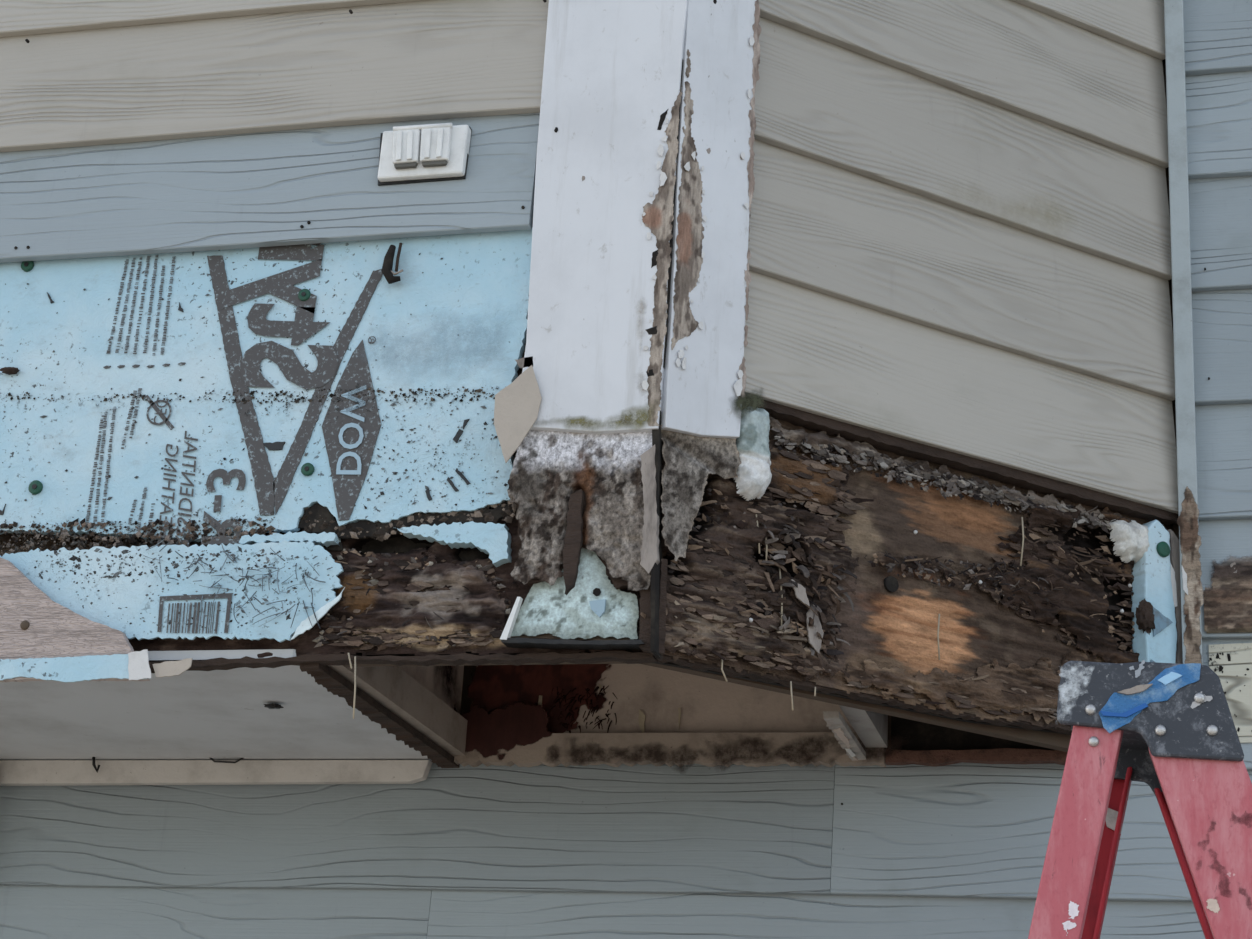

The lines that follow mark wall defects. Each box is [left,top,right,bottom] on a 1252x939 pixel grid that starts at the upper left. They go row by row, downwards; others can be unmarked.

peeling [642,49,708,426]
peeling [791,579,824,653]
peeling [128,649,192,680]
damp [550,745,695,772]
damp [715,738,831,769]
damp [859,738,903,759]